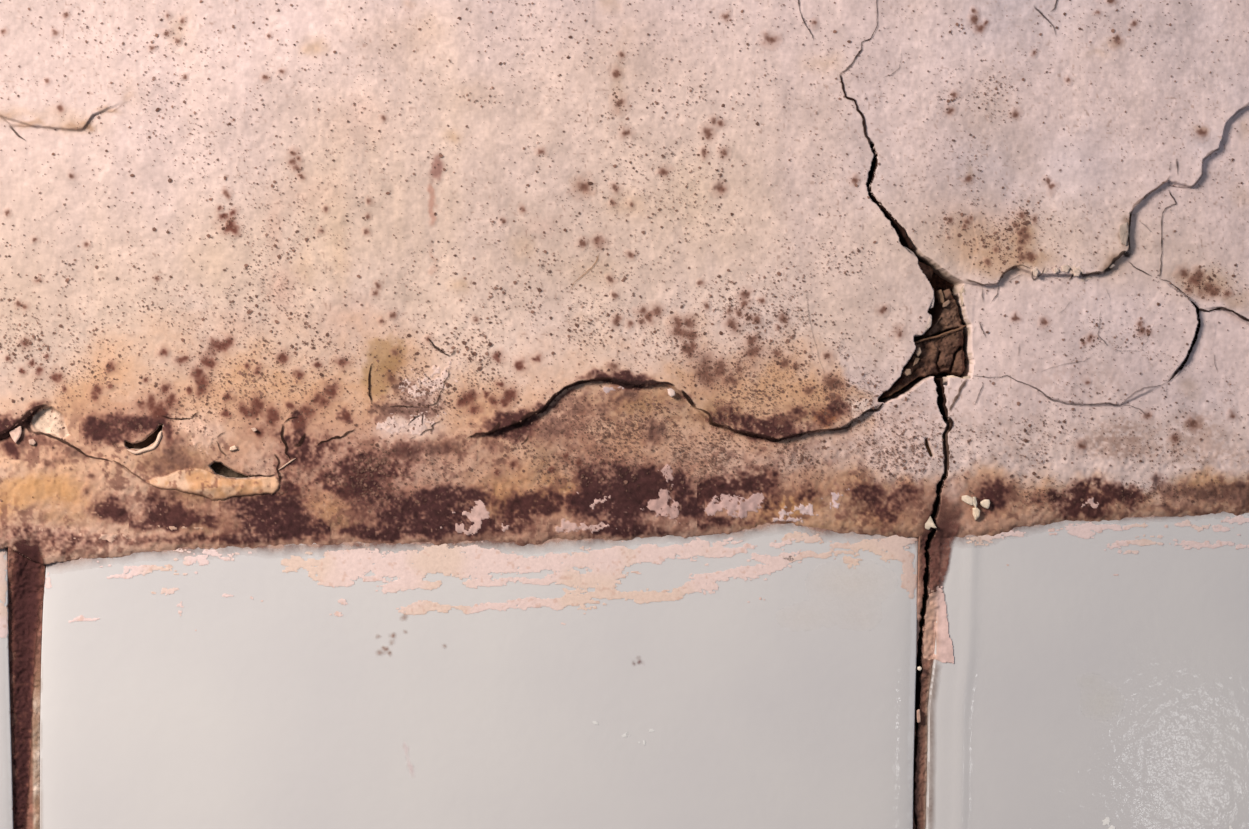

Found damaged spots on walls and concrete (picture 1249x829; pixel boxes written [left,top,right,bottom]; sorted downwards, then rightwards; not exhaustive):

crack [1035,0,1058,33]
crack [840,0,913,252]
water stain [125,176,199,253]
crack [0,404,141,479]
spalling [125,425,162,454]
flaking render [146,417,280,501]
crack [251,417,355,482]
crack [368,339,455,434]
crack [469,377,883,442]
crack [913,161,1249,829]